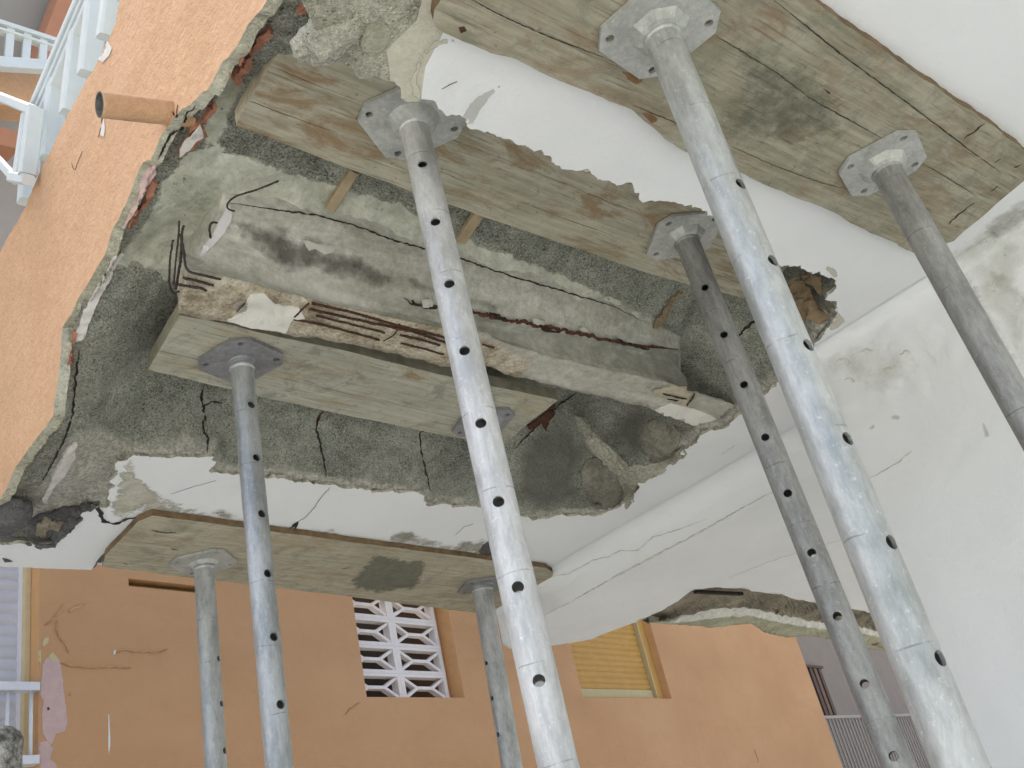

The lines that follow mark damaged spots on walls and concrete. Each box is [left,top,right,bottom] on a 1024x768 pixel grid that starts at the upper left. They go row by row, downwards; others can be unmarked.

spalling [229,24,273,86]
peeling [177,99,217,158]
peeling [67,251,124,366]
flaking render [228,293,446,355]
crack [40,350,80,485]
crack [200,390,222,452]
flaking render [653,385,716,426]
spalling [25,441,199,550]
crack [290,412,327,529]
crack [419,431,431,491]
spalling [638,587,885,651]
peeling [36,637,67,768]